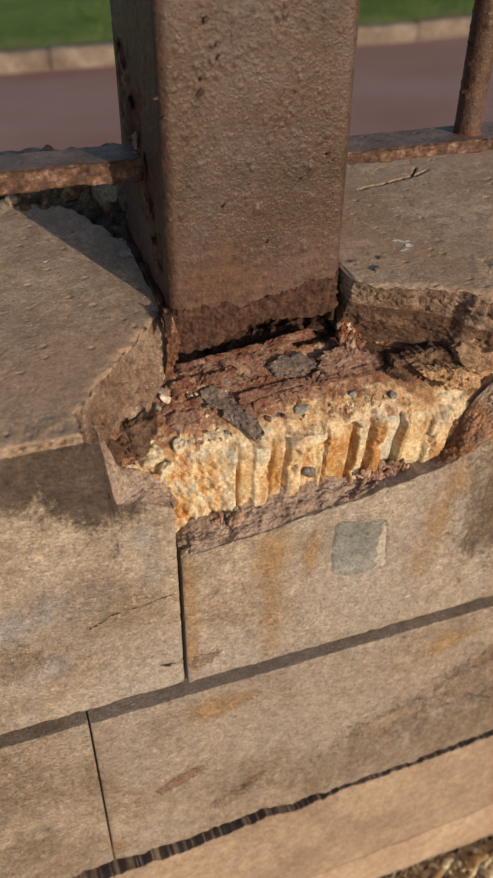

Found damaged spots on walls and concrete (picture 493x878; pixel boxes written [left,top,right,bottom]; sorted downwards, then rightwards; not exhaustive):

spalling [75,311,177,508]
rust [166,408,202,435]
peeling [218,359,276,395]
rust [168,270,408,406]
peeling [300,383,390,421]
spalling [176,458,409,558]